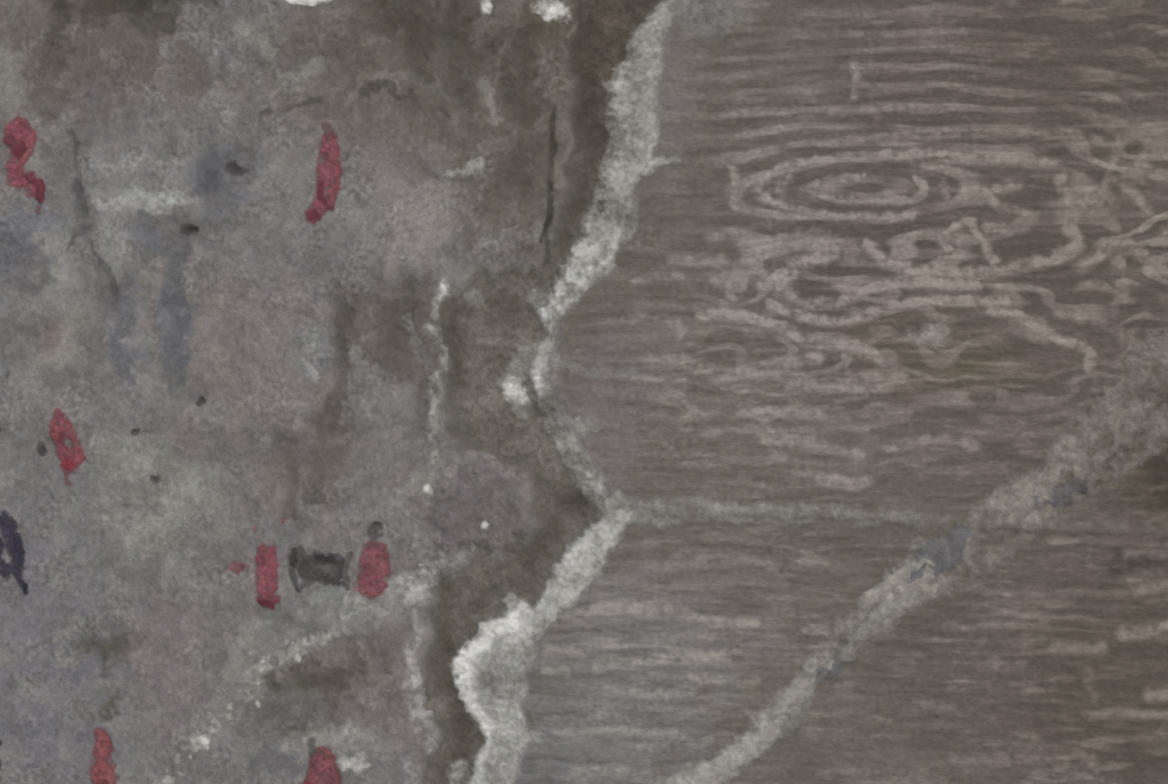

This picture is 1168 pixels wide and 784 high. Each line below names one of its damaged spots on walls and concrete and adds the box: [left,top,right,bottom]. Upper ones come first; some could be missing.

crack [542,184,552,236]
crack [654,332,1168,784]